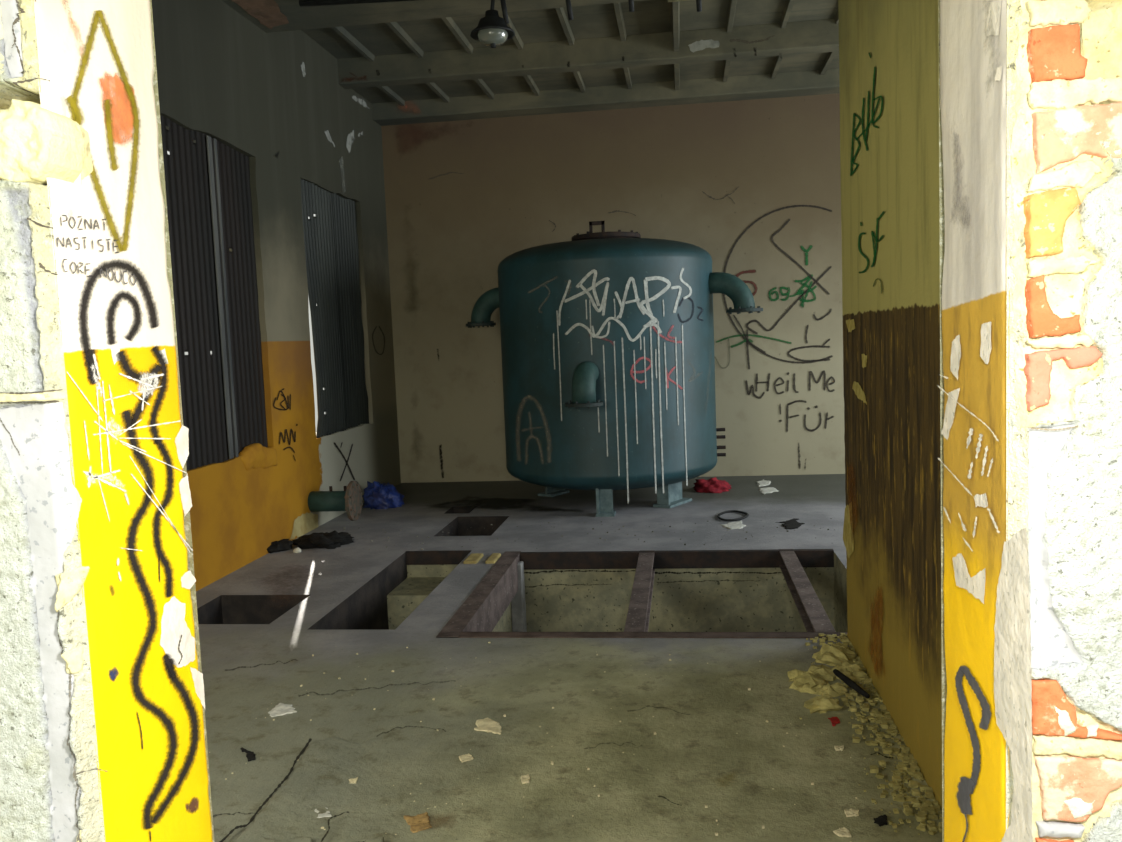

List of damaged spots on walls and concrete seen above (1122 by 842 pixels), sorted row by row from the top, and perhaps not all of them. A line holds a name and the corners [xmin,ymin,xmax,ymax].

flaking render [952,0,1122,842]
peeling [290,512,318,539]
peeling [0,402,90,842]
peeling [160,571,205,709]
crack [213,738,312,842]